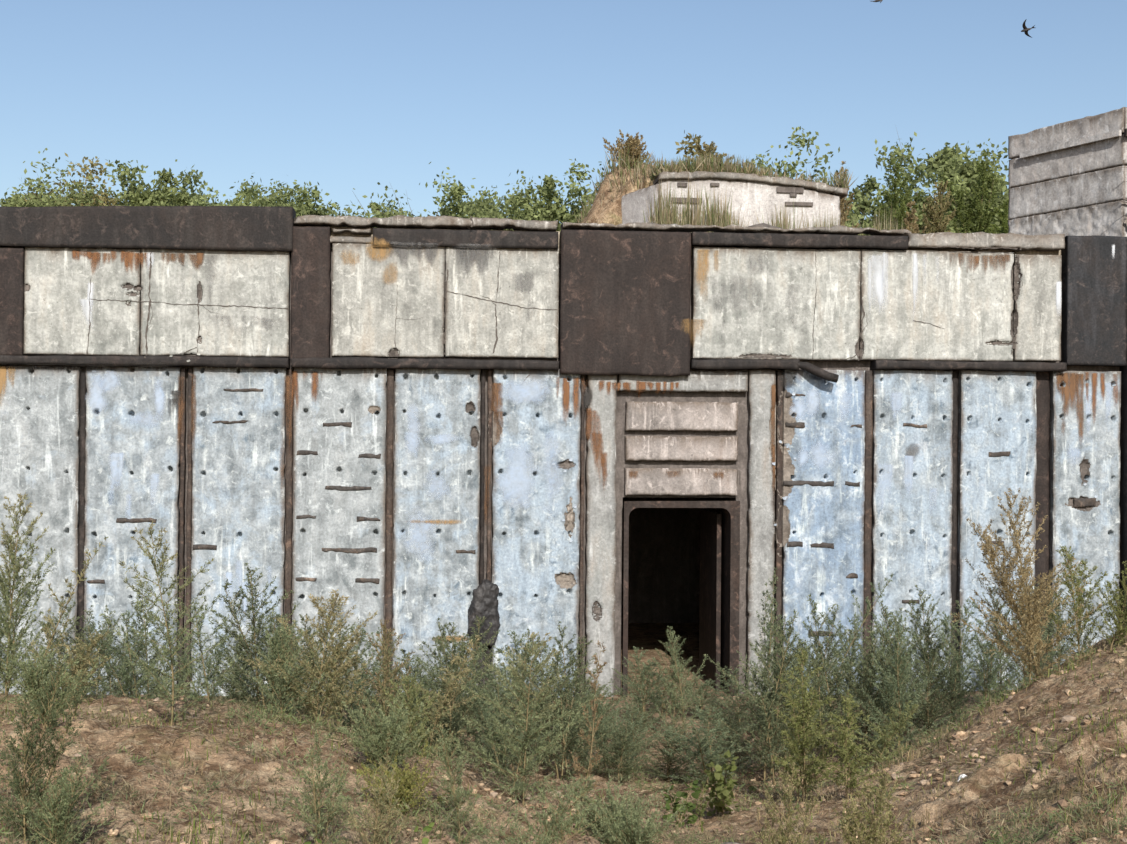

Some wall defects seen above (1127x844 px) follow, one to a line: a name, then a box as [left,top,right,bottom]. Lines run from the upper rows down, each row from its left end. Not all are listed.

corrosion [72,250,148,268]
corrosion [162,252,204,267]
crack [395,254,557,355]
corrosion [0,367,15,395]
corrosion [599,381,679,395]
corrosion [1056,373,1118,437]
corrosion [563,378,607,477]